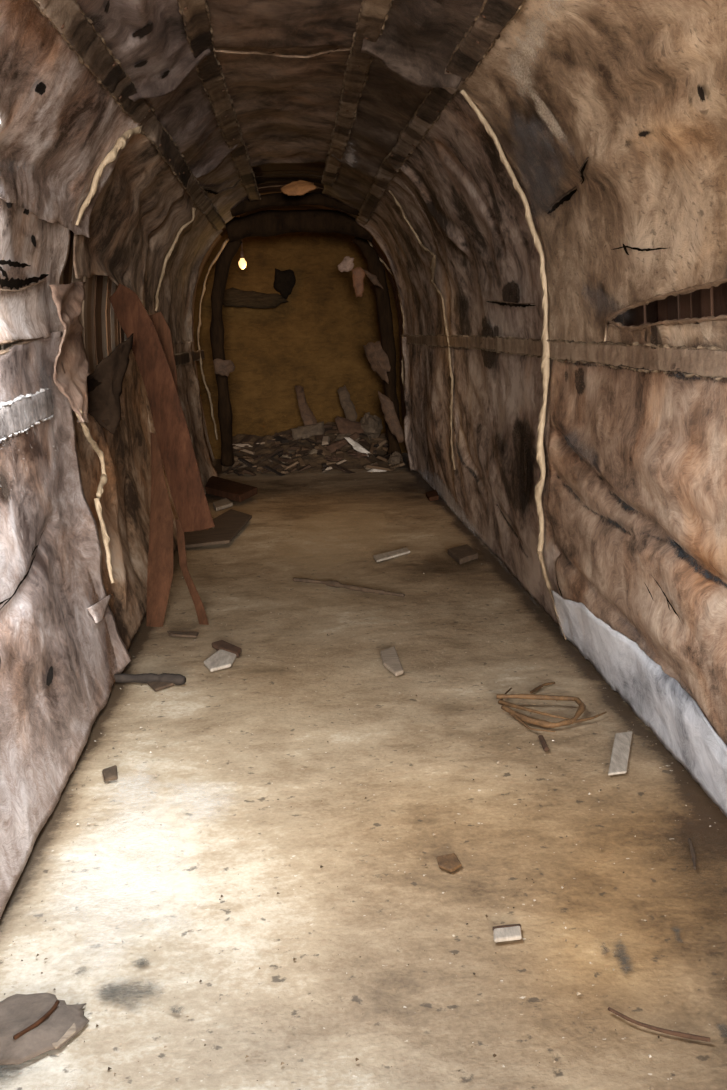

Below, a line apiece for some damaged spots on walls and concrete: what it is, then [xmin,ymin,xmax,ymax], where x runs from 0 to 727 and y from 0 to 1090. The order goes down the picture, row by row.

crack [0,522,48,610]